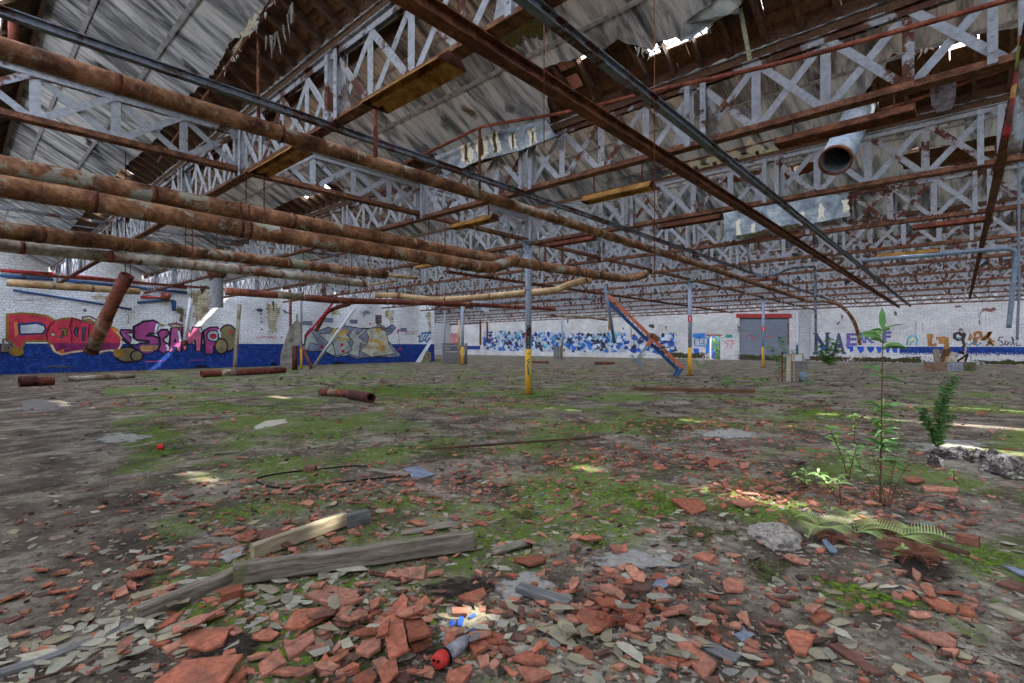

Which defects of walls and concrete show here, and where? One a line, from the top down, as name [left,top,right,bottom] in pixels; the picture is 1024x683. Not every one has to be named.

peeling [249,1,295,58]
peeling [635,0,740,61]